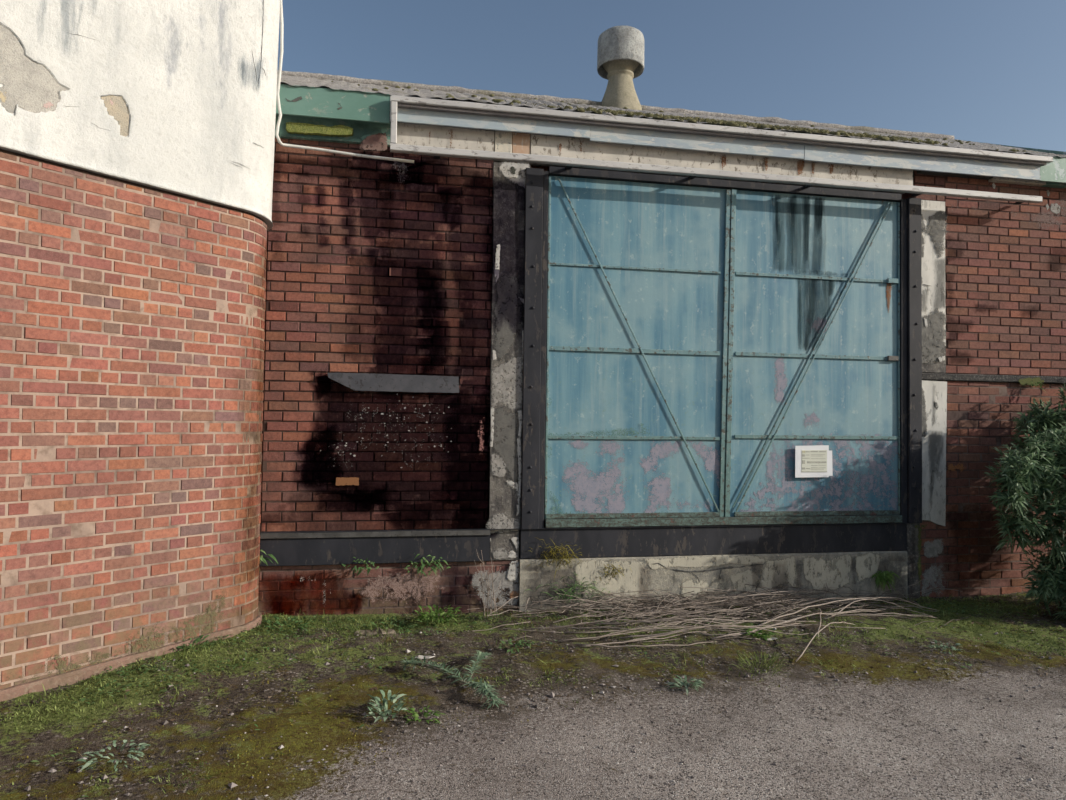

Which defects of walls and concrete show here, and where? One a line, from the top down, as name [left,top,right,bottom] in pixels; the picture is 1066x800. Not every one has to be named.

spalling [0,22,70,115]
spalling [101,94,132,137]
spalling [924,210,947,257]
water stain [296,153,525,535]
spalling [922,309,947,365]
spalling [922,389,938,437]
peeling [560,435,629,513]
peeling [639,440,720,513]
peeling [739,411,898,516]
rust [263,571,360,615]
peeling [574,552,881,607]